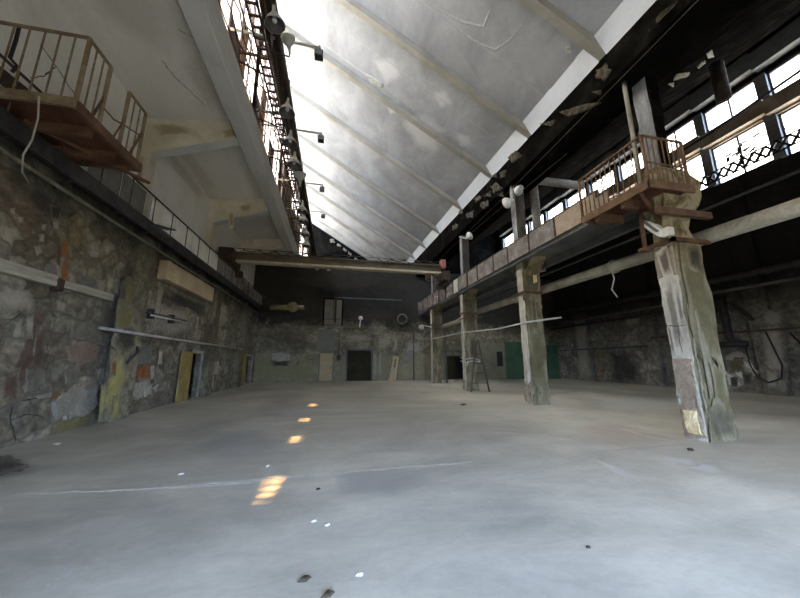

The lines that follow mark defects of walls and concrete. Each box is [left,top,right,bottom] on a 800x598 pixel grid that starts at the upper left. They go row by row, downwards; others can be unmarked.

spalling [653,245,677,279]
crack [9,398,42,442]
spalling [672,358,707,439]